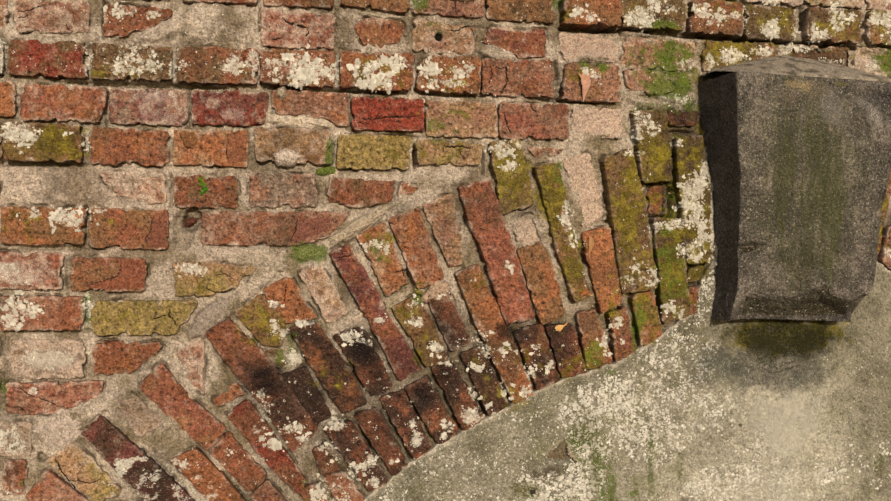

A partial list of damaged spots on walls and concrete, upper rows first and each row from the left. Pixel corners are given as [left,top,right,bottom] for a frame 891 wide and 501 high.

spalling [545,439,580,463]
leakage [697,319,838,455]